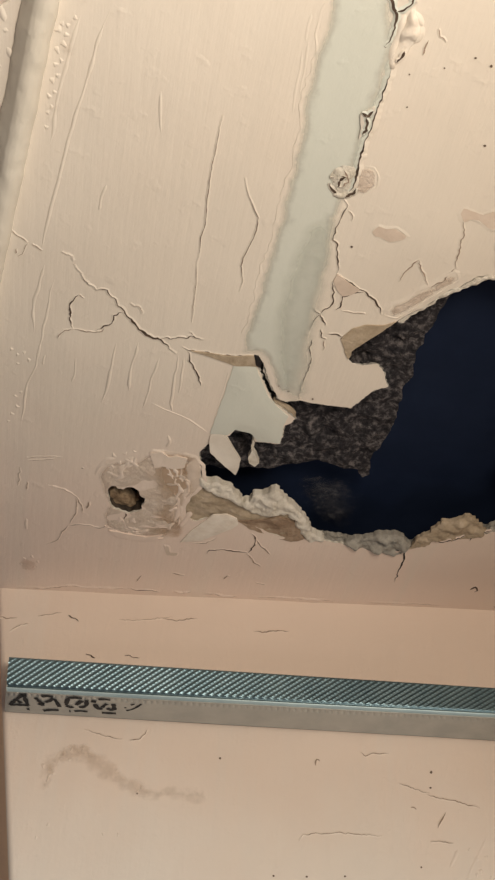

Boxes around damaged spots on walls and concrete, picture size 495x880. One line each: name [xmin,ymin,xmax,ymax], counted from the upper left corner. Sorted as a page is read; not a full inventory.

crack [12,115,262,386]
crack [297,0,448,399]
spalling [341,206,495,386]
crack [192,533,271,567]
spalling [94,358,495,557]